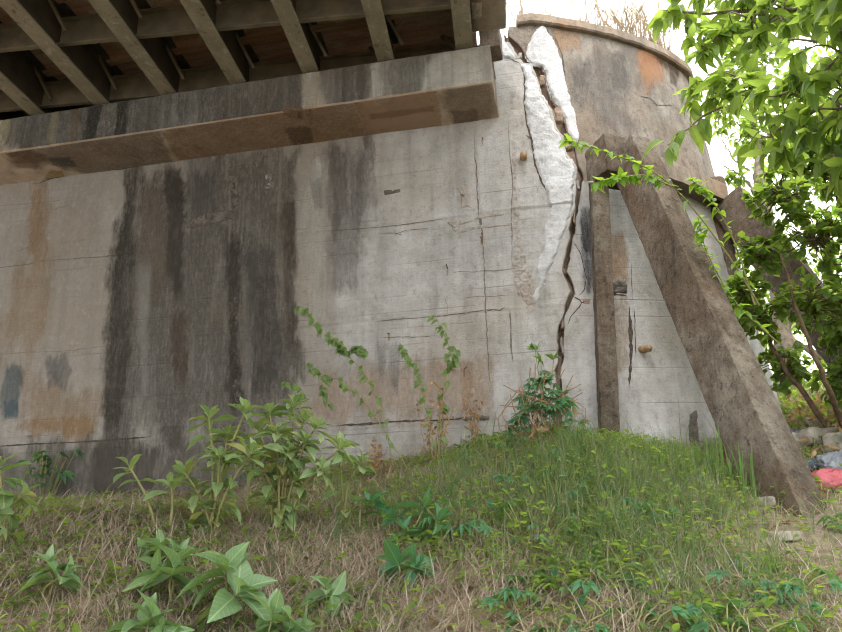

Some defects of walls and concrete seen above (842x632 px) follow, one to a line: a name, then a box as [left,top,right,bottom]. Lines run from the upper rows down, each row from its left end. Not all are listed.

water stain [0,55,431,500]
crack [377,295,513,359]
peeling [447,25,579,306]
crack [504,28,587,422]